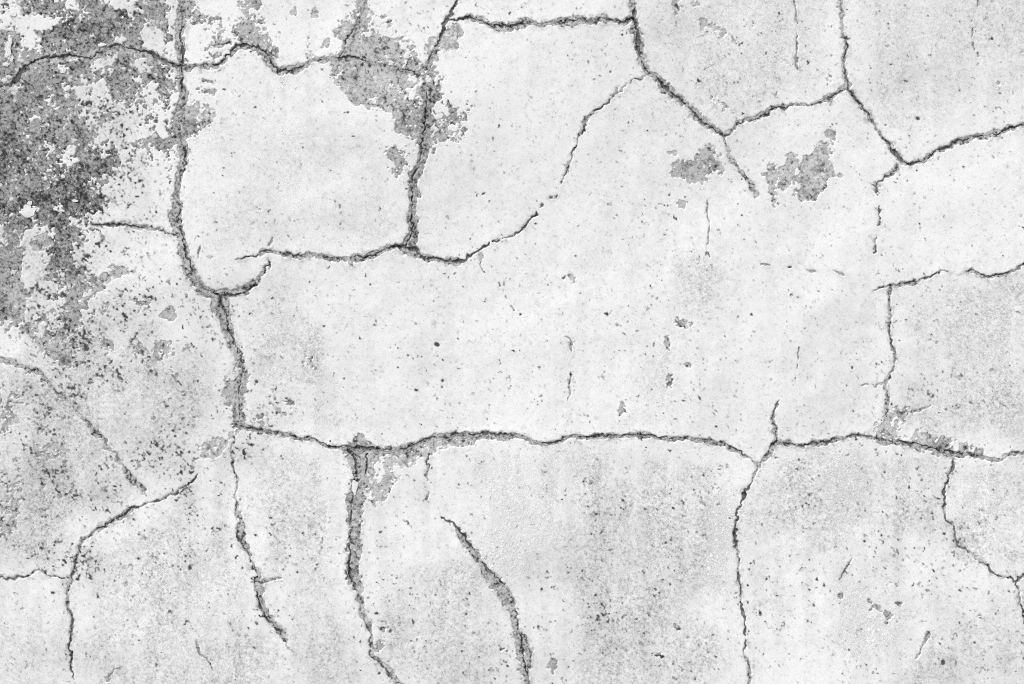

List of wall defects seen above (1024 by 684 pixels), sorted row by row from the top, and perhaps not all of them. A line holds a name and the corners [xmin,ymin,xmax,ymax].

crack [0,43,181,93]
flaking render [0,0,217,368]
crack [91,0,294,653]
flaking render [306,0,473,178]
crack [565,336,573,399]
crack [182,0,1024,273]
flaking render [667,143,725,185]
flaking render [761,129,843,208]
crack [861,270,948,421]
crack [966,263,1024,279]
crack [0,356,198,680]
crack [242,401,1024,684]